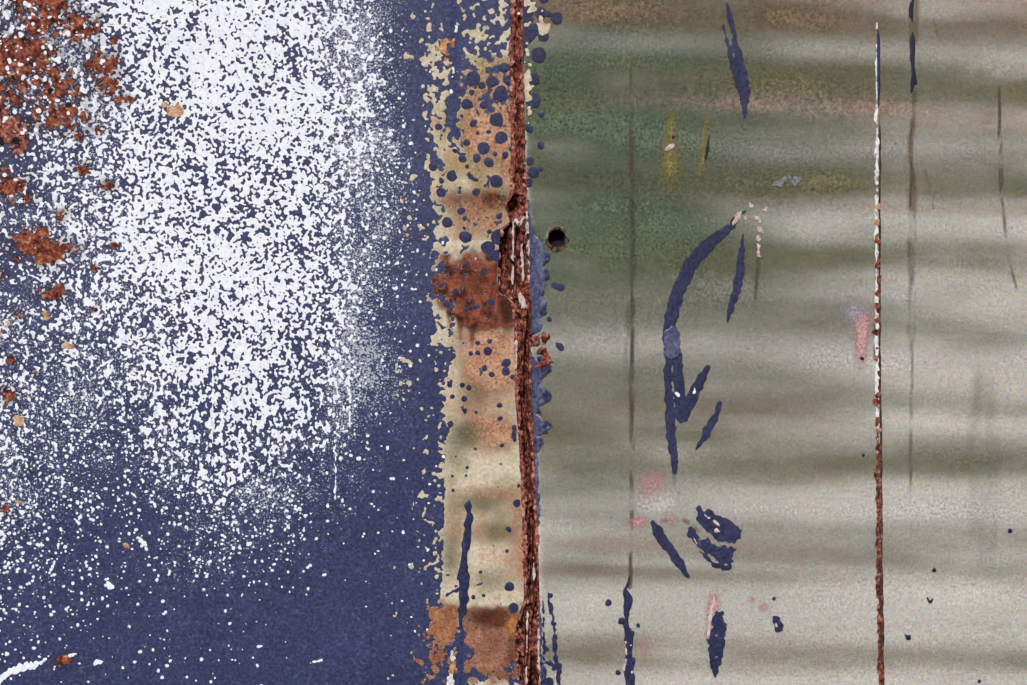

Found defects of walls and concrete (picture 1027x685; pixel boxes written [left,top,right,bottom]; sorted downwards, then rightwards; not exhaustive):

corrosion [0,0,135,155]
corrosion [0,167,32,205]
corrosion [11,226,80,265]
peeling [0,0,552,685]
corrosion [412,0,541,685]